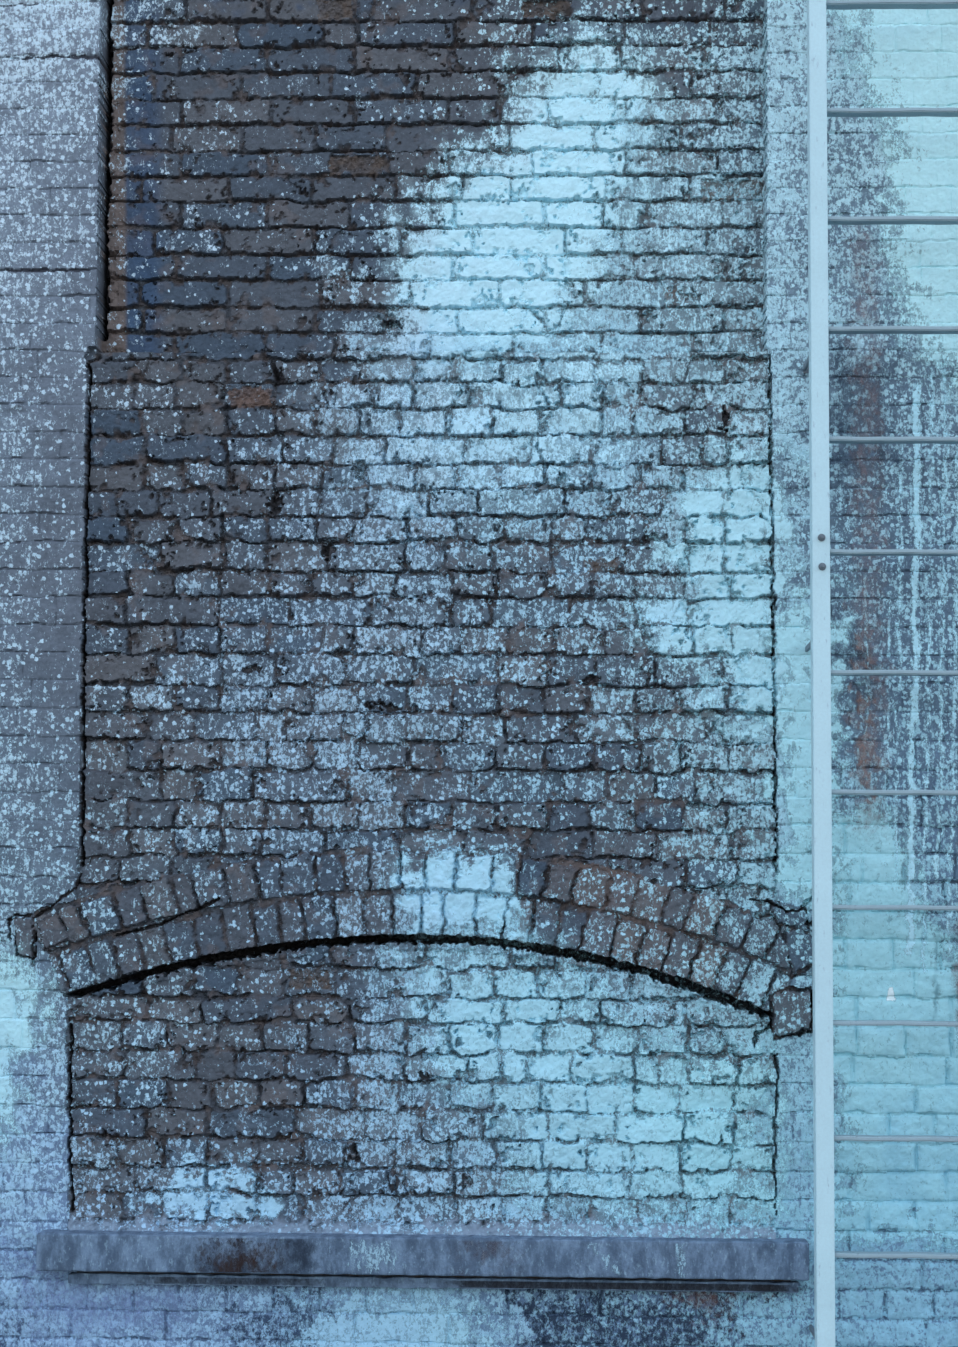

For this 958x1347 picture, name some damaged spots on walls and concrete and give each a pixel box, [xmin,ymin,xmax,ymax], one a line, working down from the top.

crack [0,0,114,967]
damp [288,11,812,933]
crack [749,353,812,922]
damp [826,9,958,1280]
damp [0,939,61,1165]
crack [115,897,221,937]
crack [62,933,780,1216]
damp [355,833,814,1278]
crack [807,983,815,1030]